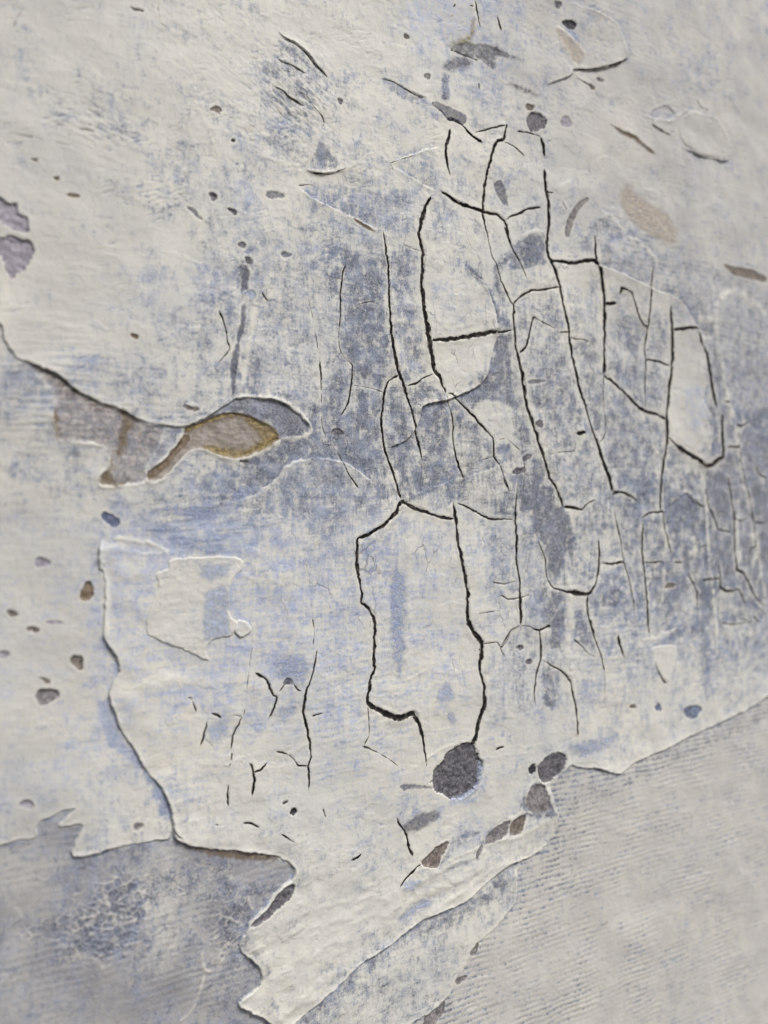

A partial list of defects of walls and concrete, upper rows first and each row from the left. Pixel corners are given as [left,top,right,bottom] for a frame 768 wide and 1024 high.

peeling [38,368,162,484]
crack [308,118,768,766]
crack [187,603,326,843]
peeling [0,809,293,1024]
peeling [412,697,768,1024]